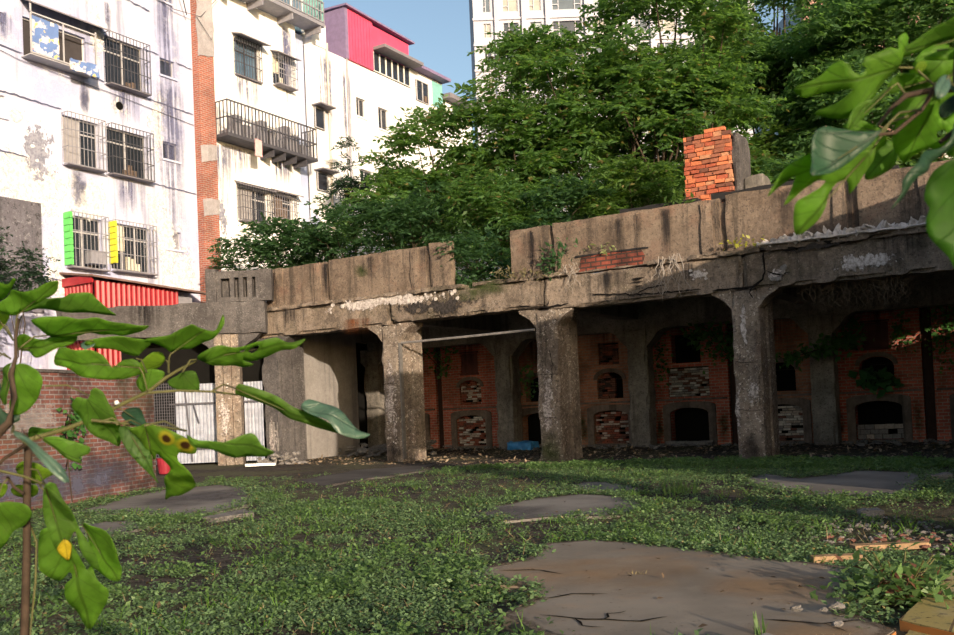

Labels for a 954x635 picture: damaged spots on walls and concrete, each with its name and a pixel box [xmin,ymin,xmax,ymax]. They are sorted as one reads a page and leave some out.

damp [159,0,172,47]
damp [161,88,180,167]
peeling [0,124,109,298]
peeling [756,215,926,253]
flaking render [327,289,485,319]